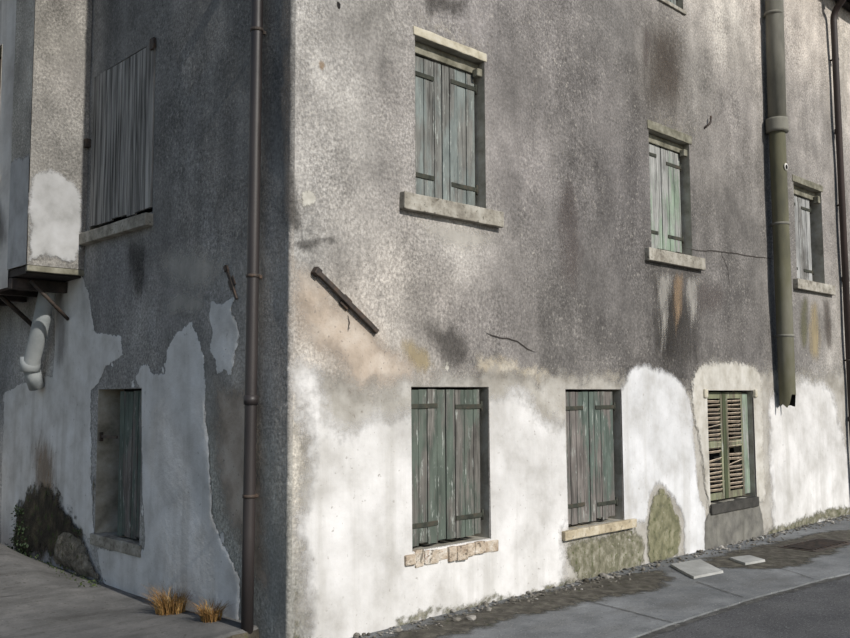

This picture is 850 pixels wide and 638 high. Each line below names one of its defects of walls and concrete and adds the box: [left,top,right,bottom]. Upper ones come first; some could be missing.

crack [687,248,773,284]
peeling [299,409,316,514]
peeling [297,273,421,434]
peeling [433,358,627,427]
peeling [685,388,709,521]
peeling [752,366,779,534]
peeling [795,368,850,475]
mould [14,482,85,562]
flaking render [53,532,103,580]
leakage [545,528,645,590]
peeling [562,483,685,583]
leakage [397,594,510,627]